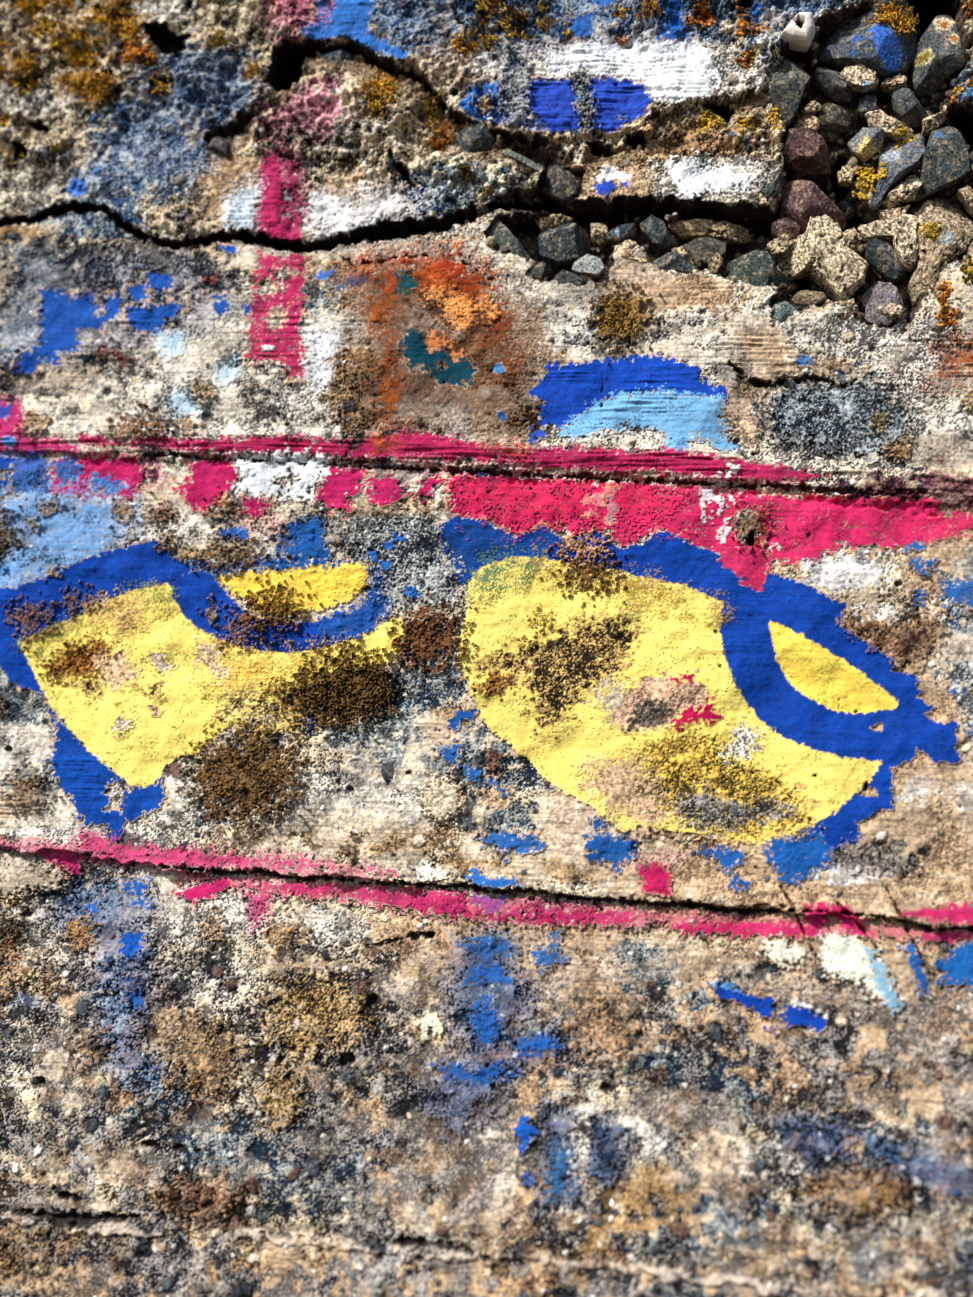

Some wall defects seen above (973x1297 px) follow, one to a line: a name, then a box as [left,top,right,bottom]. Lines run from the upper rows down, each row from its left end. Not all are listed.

peeling [561,11,596,40]
crack [0,38,771,267]
hole [586,142,614,157]
hole [627,130,646,150]
spalling [698,0,973,329]
spalling [484,159,692,284]
crack [159,863,973,974]